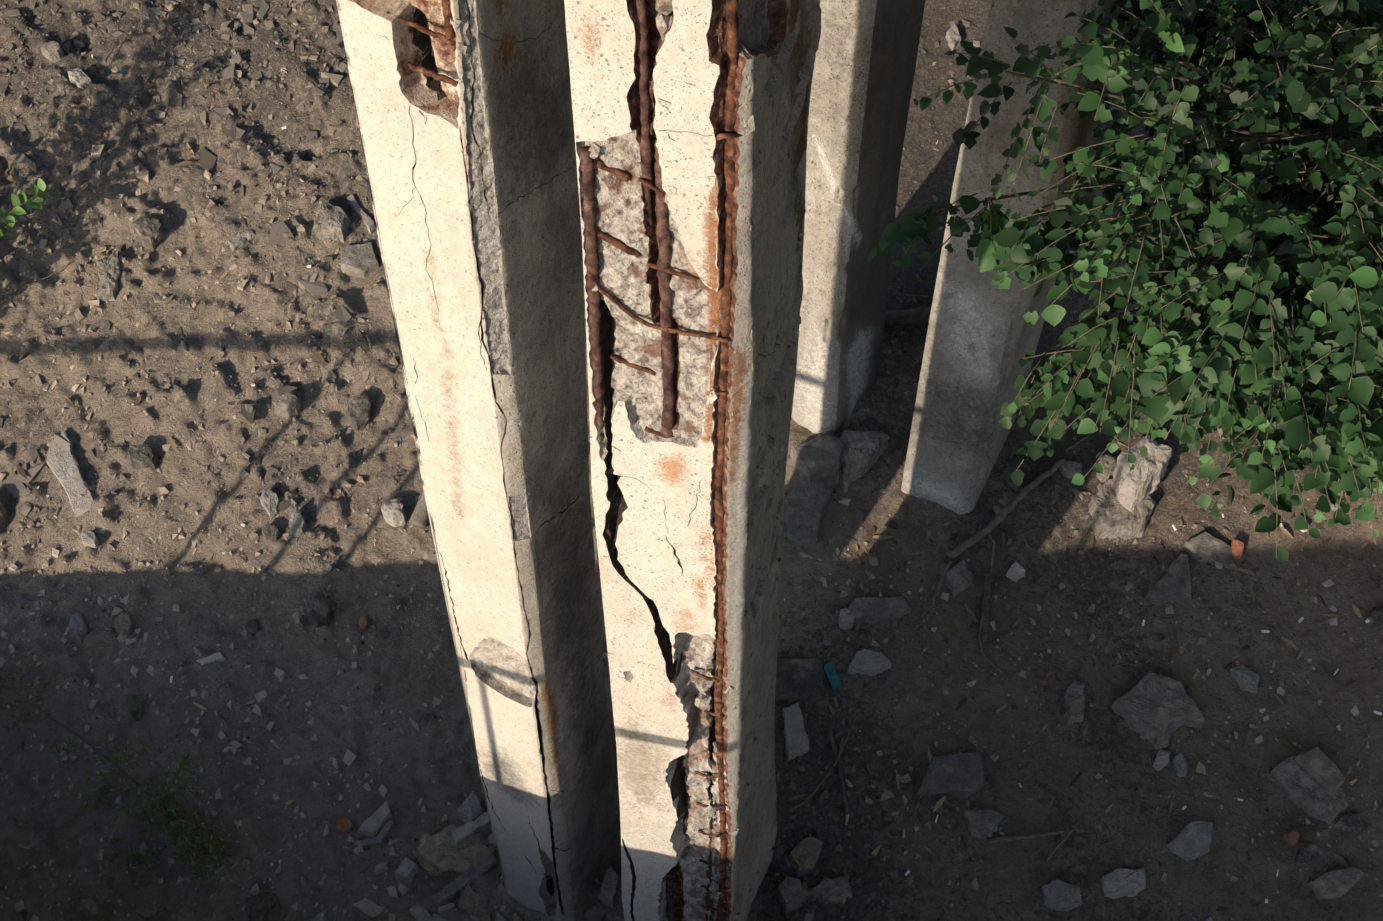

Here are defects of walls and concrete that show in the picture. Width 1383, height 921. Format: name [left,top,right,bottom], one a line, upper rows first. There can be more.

crack [395,105,440,325]
crack [413,359,429,441]
spalling [348,0,511,375]
crack [459,0,701,921]
spalling [576,0,789,921]
corrosion [702,185,723,441]
corrosion [729,355,745,481]
crack [437,543,469,661]